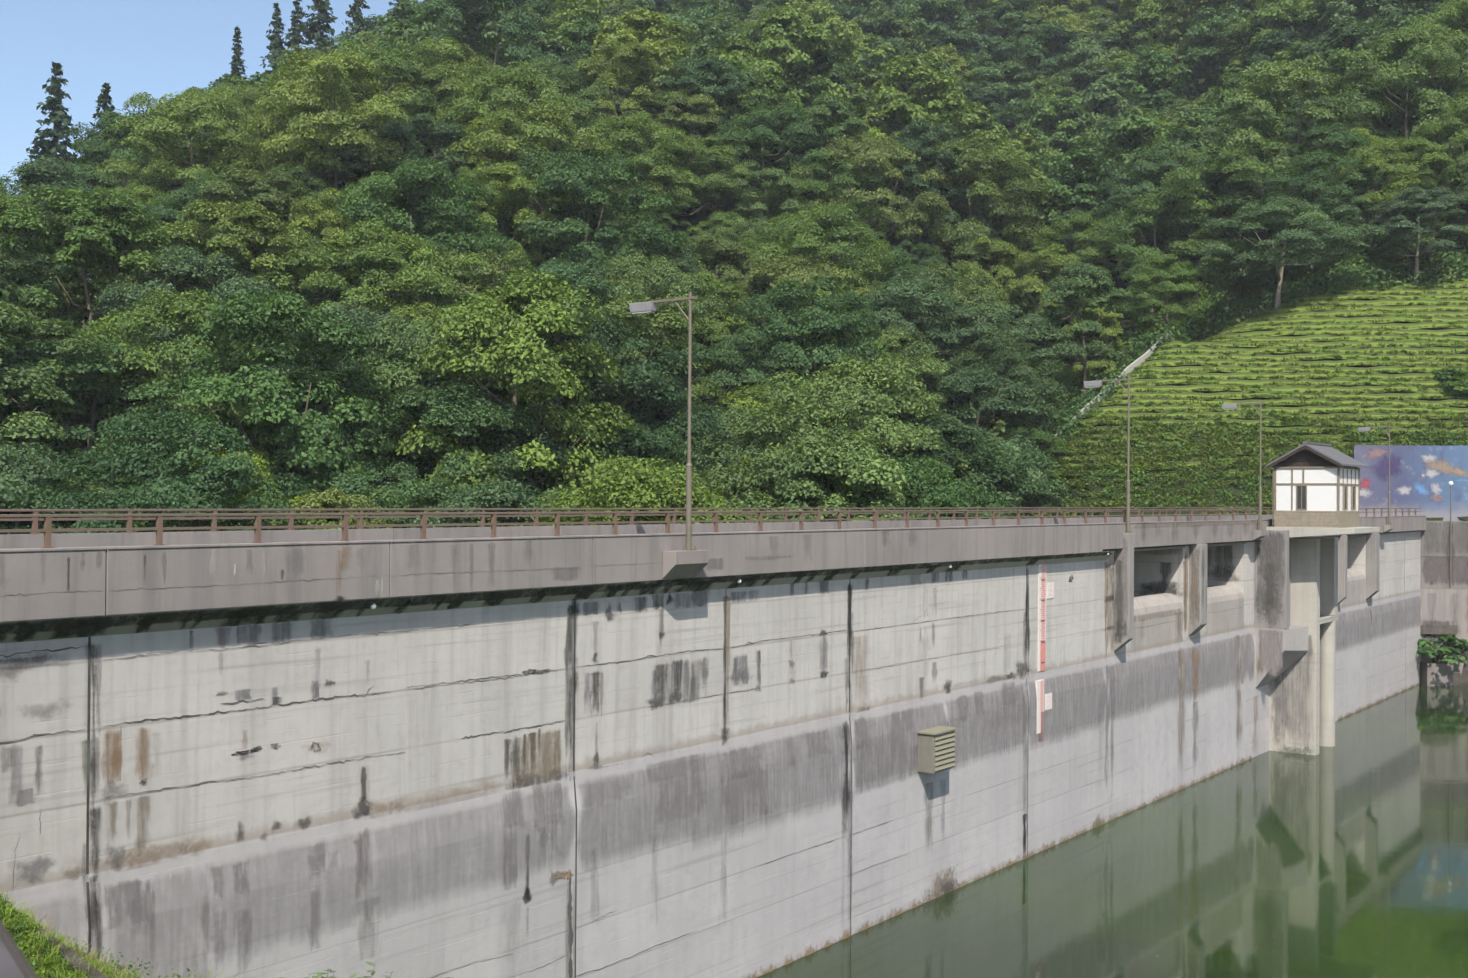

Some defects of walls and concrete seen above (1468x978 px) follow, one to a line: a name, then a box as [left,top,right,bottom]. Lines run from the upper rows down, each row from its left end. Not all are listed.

corrosion [138,741,148,845]
leakage [0,534,1285,902]
corrosion [748,757,1252,978]